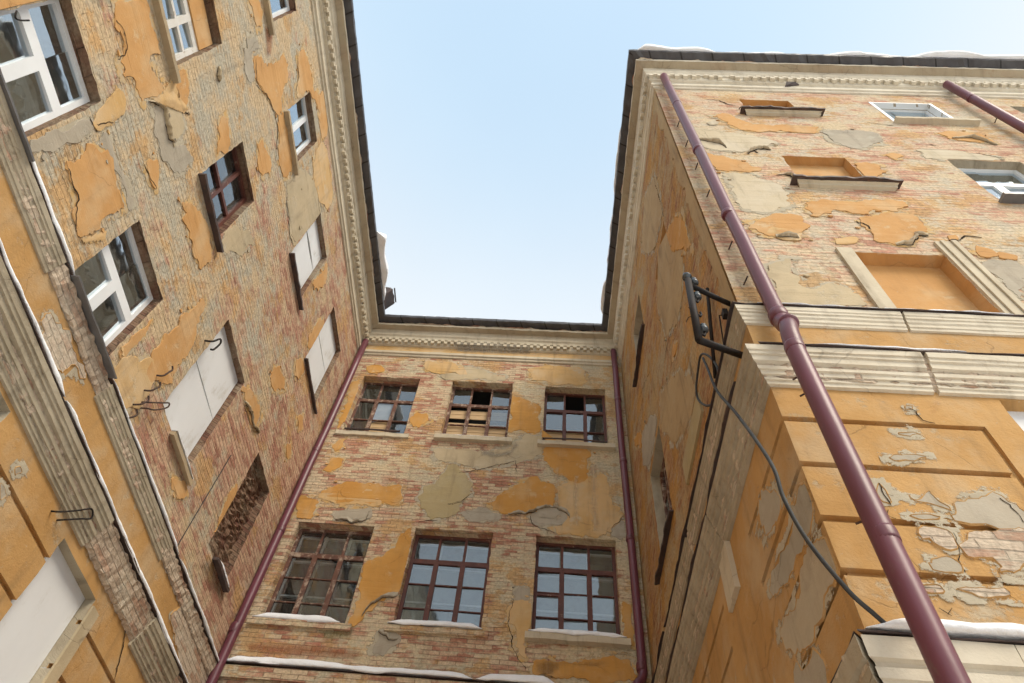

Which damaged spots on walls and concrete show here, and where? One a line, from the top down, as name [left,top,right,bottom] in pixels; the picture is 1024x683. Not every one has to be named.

peeling [30,0,193,246]
peeling [177,193,255,270]
peeling [694,113,1018,261]
peeling [112,294,207,414]
peeling [348,524,415,627]
peeling [290,360,626,541]
flaking render [755,478,840,683]
flaking render [870,403,1024,607]